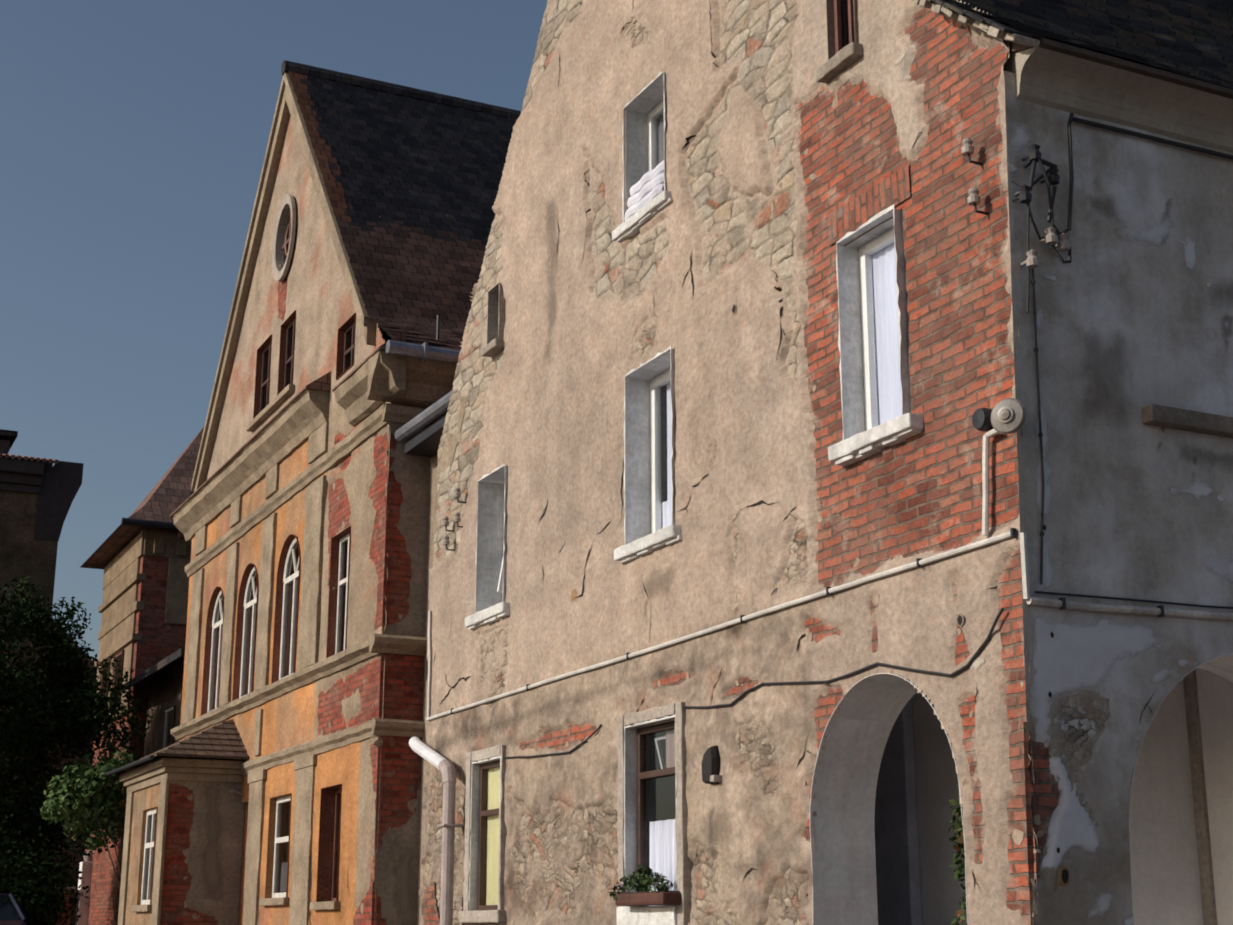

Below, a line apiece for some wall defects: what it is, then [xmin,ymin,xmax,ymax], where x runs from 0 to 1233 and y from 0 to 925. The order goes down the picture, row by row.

spalling [587,153,669,304]
crack [682,249,694,300]
spalling [368,423,412,634]
crack [541,458,624,598]
crack [732,500,796,523]
spalling [685,0,1161,925]
spalling [317,653,424,736]
crack [433,630,470,706]
spalling [518,723,597,752]
spalling [161,783,219,925]
spalling [353,736,466,925]